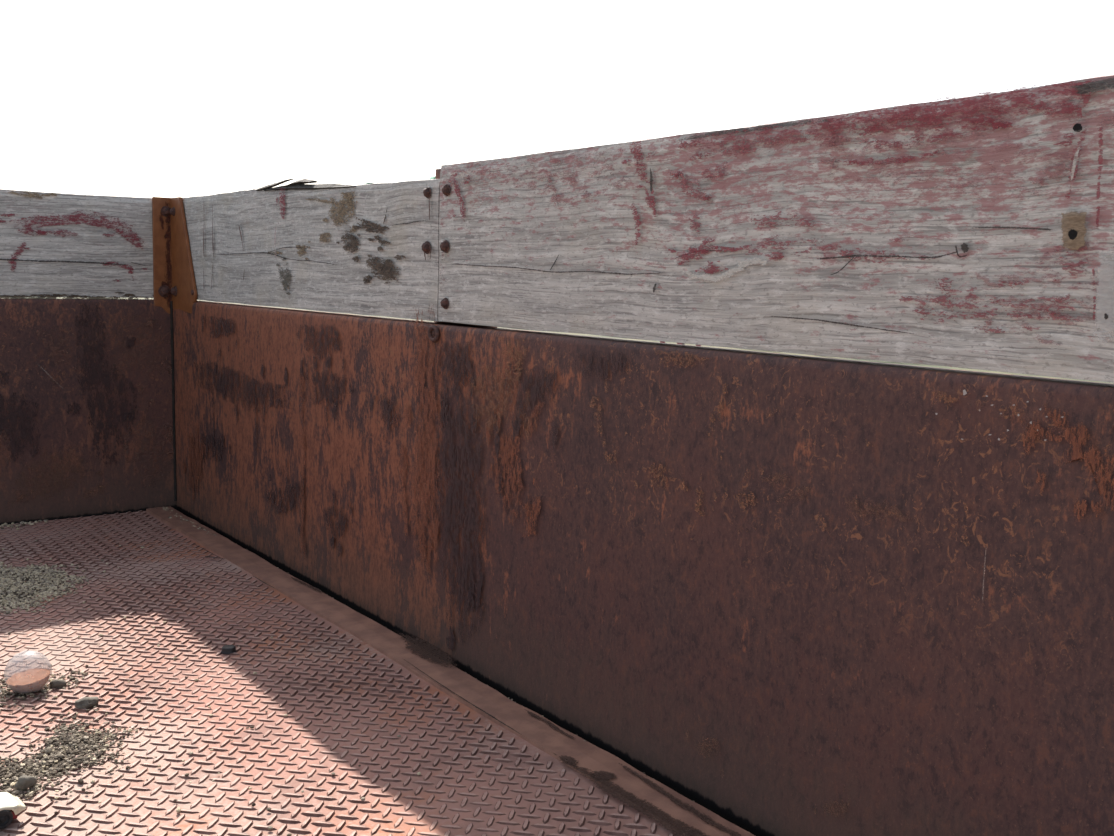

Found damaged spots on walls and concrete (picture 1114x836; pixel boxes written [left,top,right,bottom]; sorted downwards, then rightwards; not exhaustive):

peeling [838,118,1013,166]
peeling [18,228,78,249]
peeling [103,227,144,249]
peeling [668,213,762,272]
crack [817,252,957,275]
crack [975,224,1051,232]
rust [486,402,544,538]
rust [999,405,1114,521]